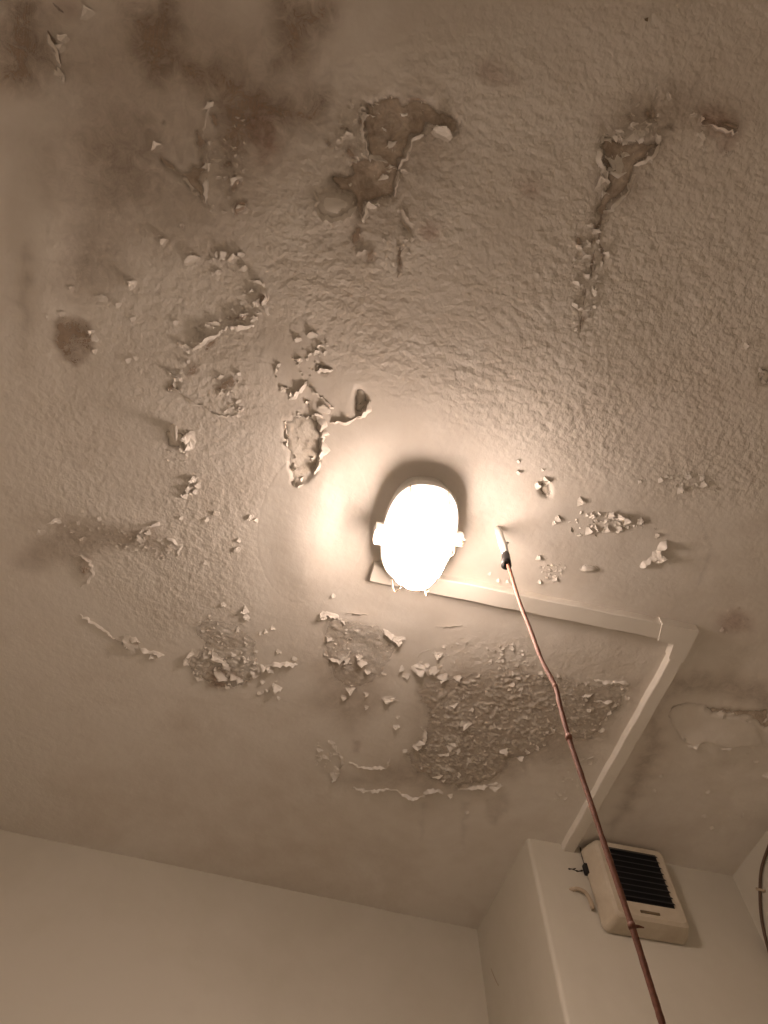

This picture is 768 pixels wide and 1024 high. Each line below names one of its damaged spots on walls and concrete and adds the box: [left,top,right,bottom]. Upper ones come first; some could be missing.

peeling [326,95,462,267]
peeling [571,79,672,335]
spalling [690,112,739,157]
damp [56,322,91,363]
peeling [167,250,270,393]
peeling [163,424,196,462]
spalling [180,476,201,499]
peeling [274,331,372,488]
spalling [552,497,668,568]
spalling [182,606,297,700]
peeling [316,611,406,710]
spalling [352,641,631,801]